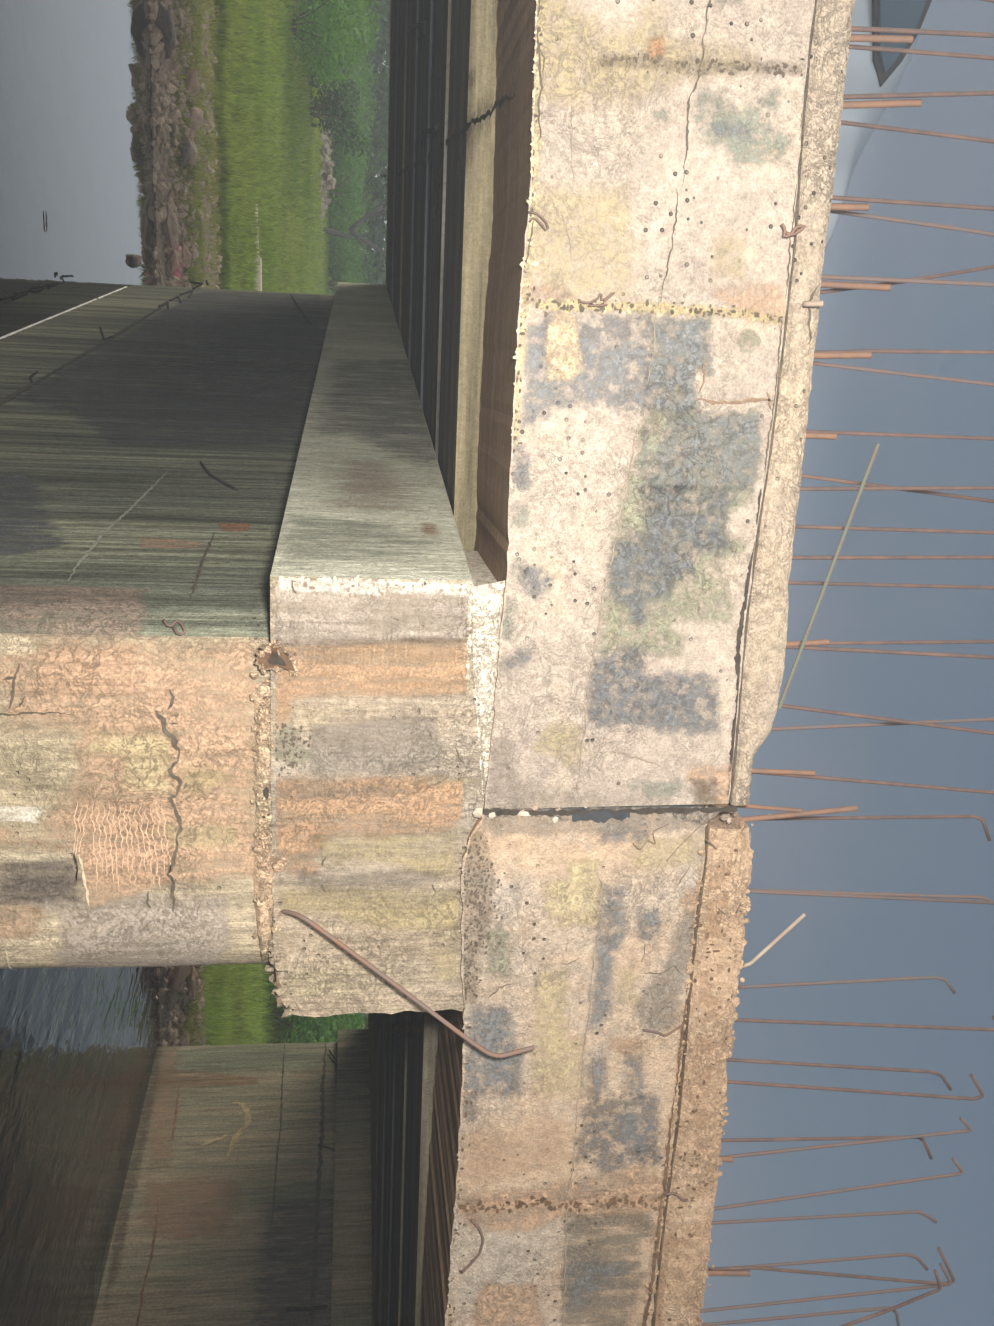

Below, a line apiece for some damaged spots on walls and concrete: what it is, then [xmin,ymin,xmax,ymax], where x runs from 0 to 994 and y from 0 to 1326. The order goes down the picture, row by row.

crack [568,98,576,175]
crack [647,0,711,383]
leakage [18,291,323,447]
leakage [513,446,529,487]
leakage [523,312,760,735]
crack [575,415,661,805]
leakage [0,585,256,968]
crack [146,690,187,912]
spalling [273,707,313,776]
rust [688,767,731,804]
leakage [562,1214,652,1326]